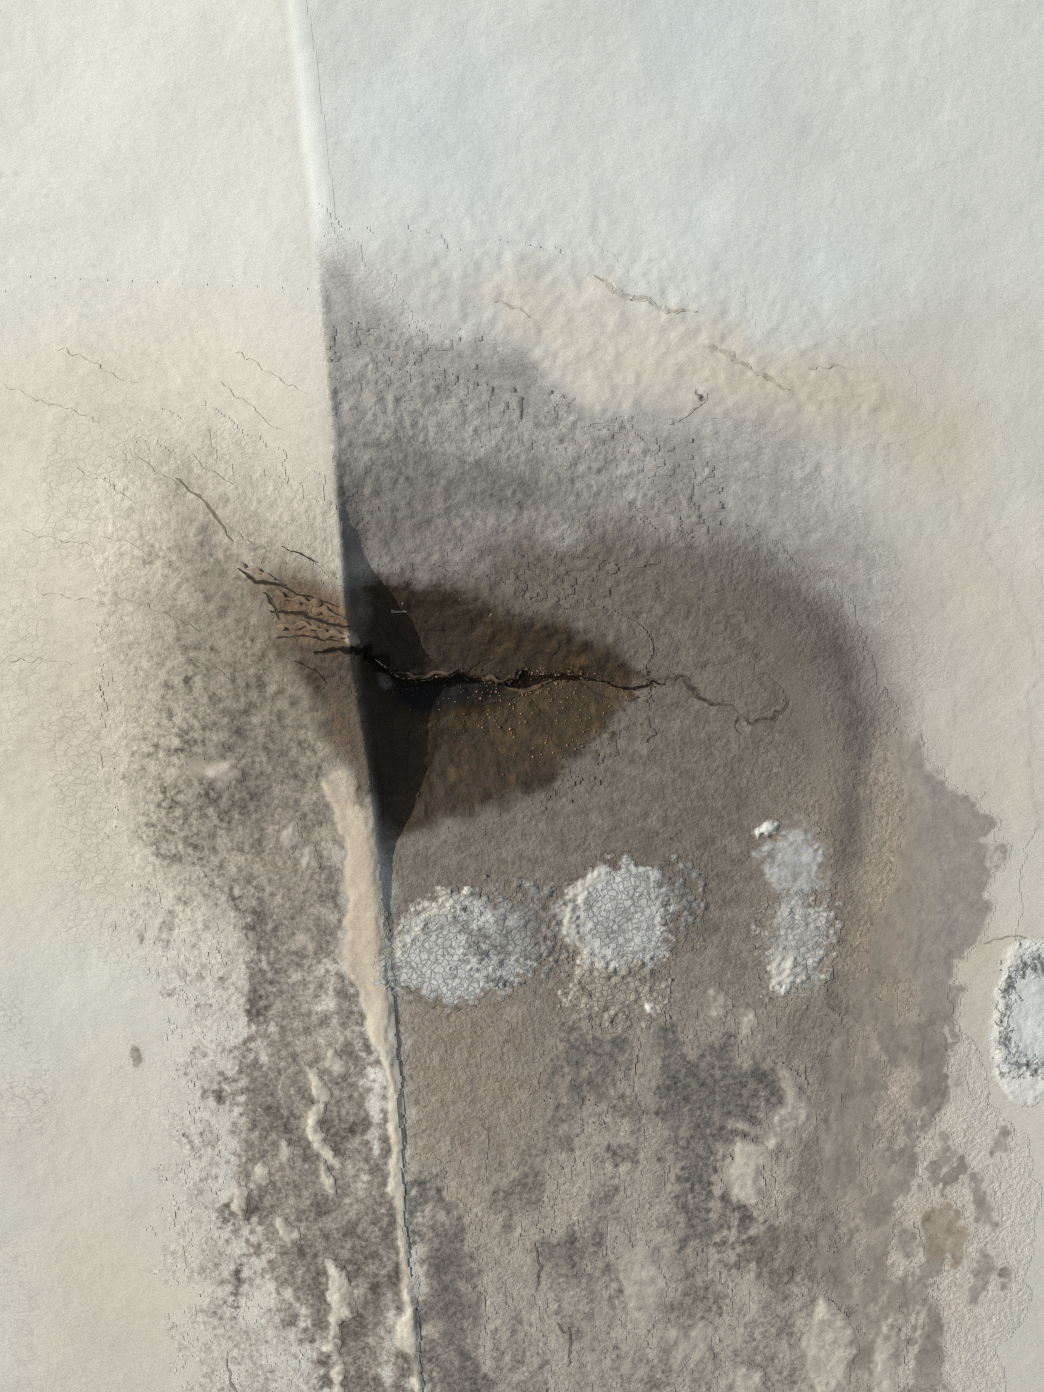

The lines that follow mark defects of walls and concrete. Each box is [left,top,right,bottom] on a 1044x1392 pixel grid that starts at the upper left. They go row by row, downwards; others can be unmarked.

crack [2,383,102,423]
crack [59,347,132,382]
crack [220,351,305,429]
crack [40,593,232,681]
crack [137,452,788,735]
leakage [0,202,956,1392]
leakage [954,828,1034,1103]